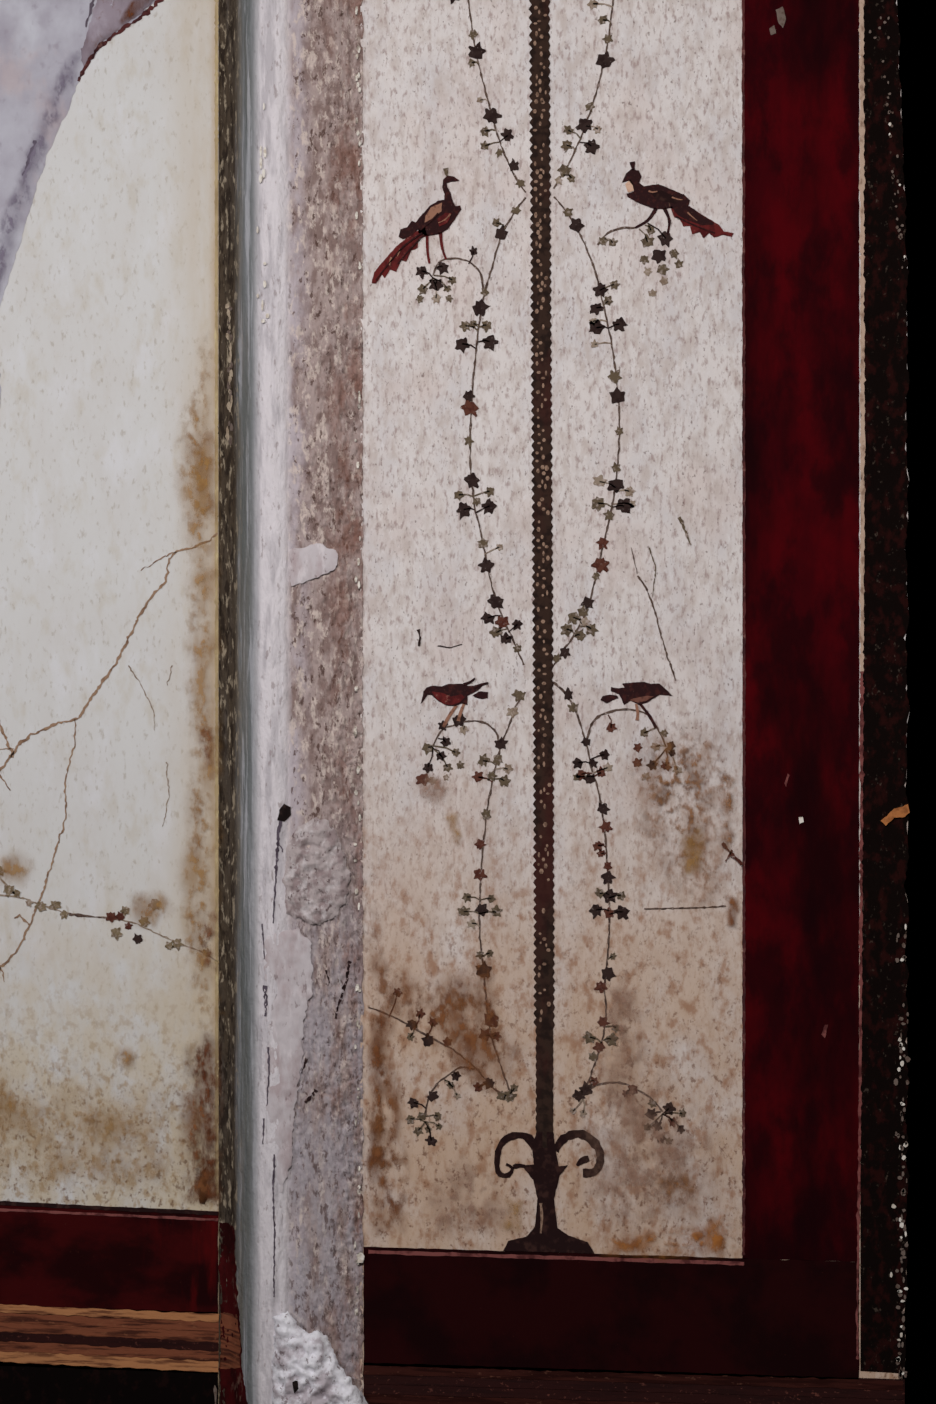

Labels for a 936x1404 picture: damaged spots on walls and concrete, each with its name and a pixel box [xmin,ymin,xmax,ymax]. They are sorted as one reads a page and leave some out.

spalling [77,0,164,82]
crack [0,533,218,981]
water stain [183,409,214,986]
water stain [649,745,733,880]
water stain [729,897,738,926]
water stain [609,1062,691,1198]
water stain [613,1221,725,1251]